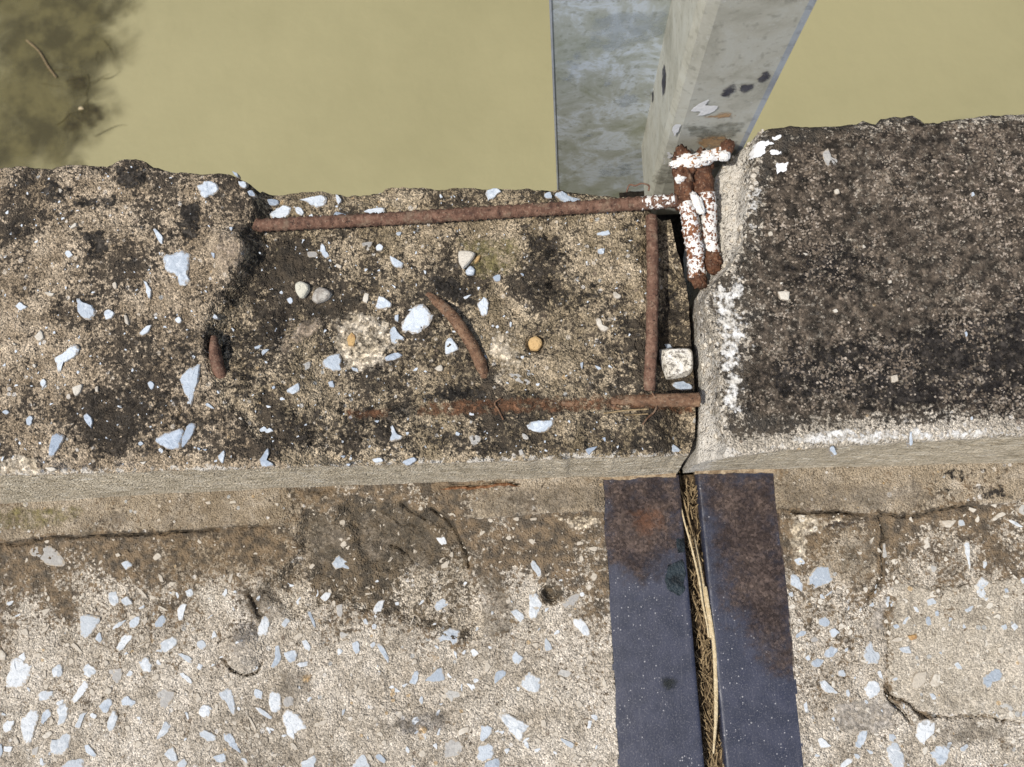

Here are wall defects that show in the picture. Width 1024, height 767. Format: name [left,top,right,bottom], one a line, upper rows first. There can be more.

spalling [192,171,727,468]
rust [417,395,692,415]
damp [713,119,1024,445]
crack [13,529,211,545]
crack [785,506,1016,723]